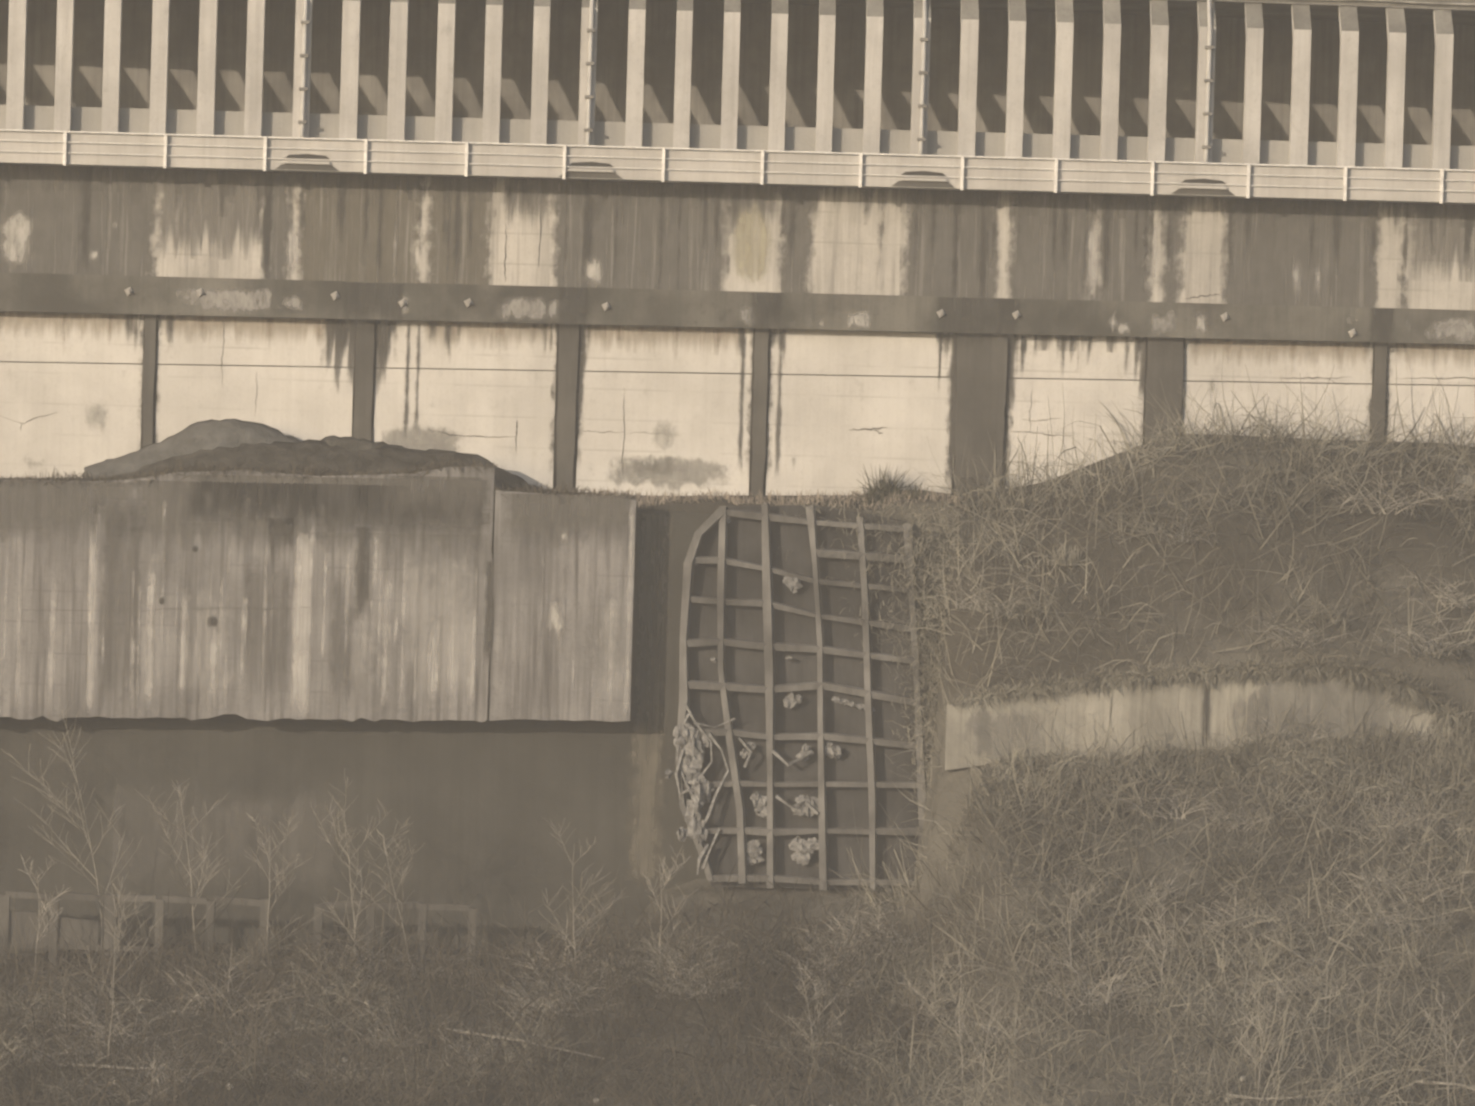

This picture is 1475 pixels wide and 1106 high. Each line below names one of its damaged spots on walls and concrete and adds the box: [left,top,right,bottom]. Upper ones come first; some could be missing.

damp [0,164,842,472]
damp [863,188,1475,481]
damp [0,474,484,704]
damp [470,562,493,695]